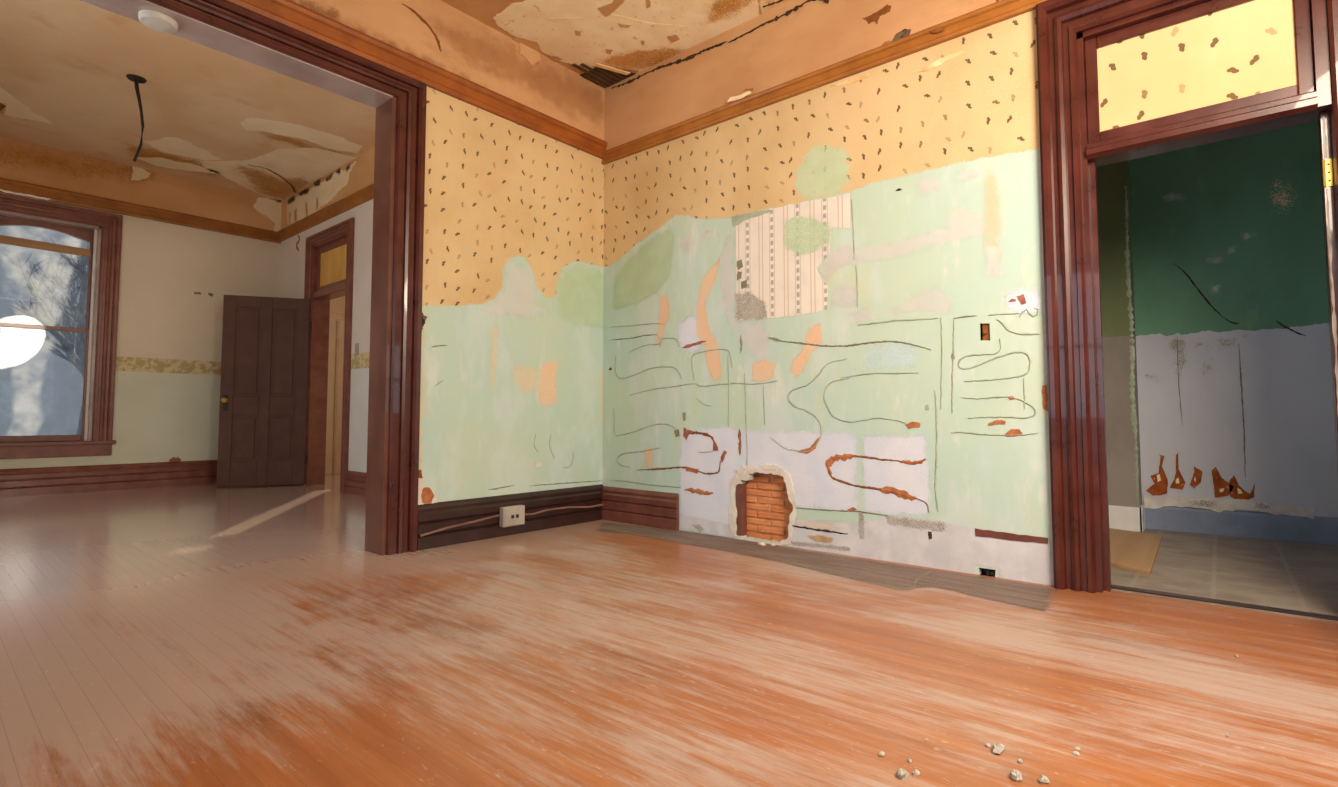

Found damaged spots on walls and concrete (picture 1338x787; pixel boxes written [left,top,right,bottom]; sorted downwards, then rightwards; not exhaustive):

flaking render [493,0,791,72]
peeling [863,4,891,24]
flaking render [121,118,363,232]
flaking render [418,312,437,505]
flaking render [675,153,1054,586]